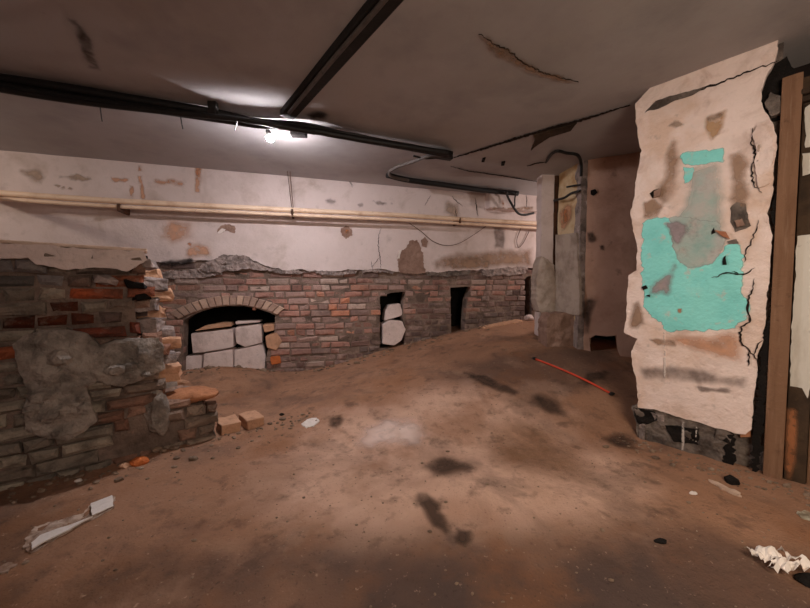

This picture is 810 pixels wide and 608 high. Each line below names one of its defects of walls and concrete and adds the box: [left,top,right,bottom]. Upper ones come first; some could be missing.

crack [479,34,578,82]
crack [701,60,779,90]
spalling [93,237,471,382]
peeling [640,148,751,332]
crack [712,128,777,472]
spalling [631,404,751,462]